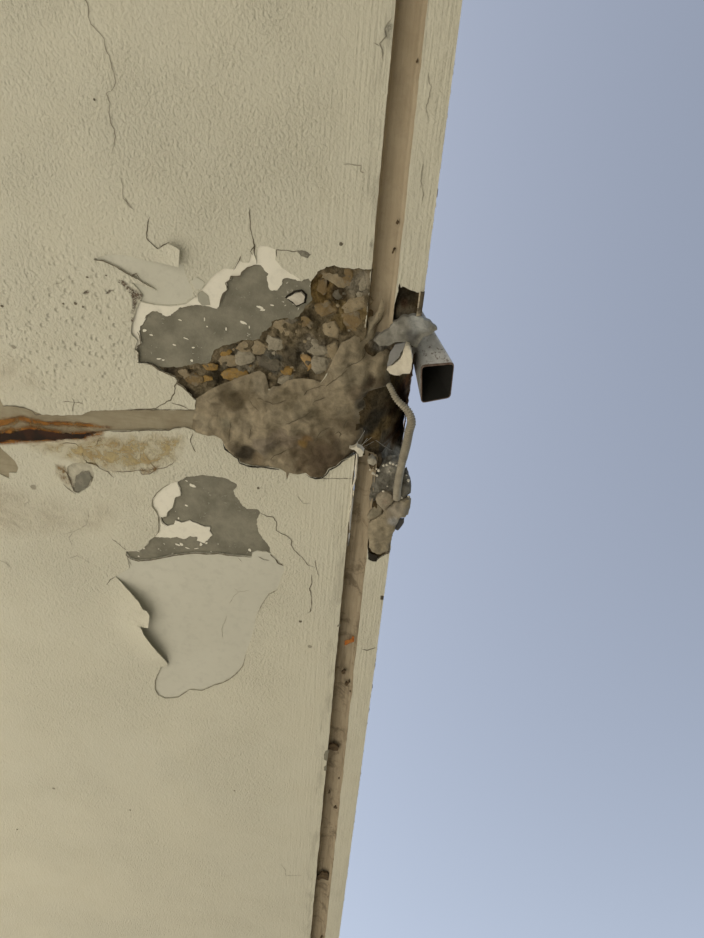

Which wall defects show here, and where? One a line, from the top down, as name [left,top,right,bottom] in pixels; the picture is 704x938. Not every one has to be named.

crack [85,0,116,151]
spalling [95,241,413,399]
spalling [393,283,425,320]
peeling [0,447,18,478]
corrosion [0,416,108,444]
spalling [61,462,99,493]
spalling [354,373,410,458]
peeling [116,475,284,698]